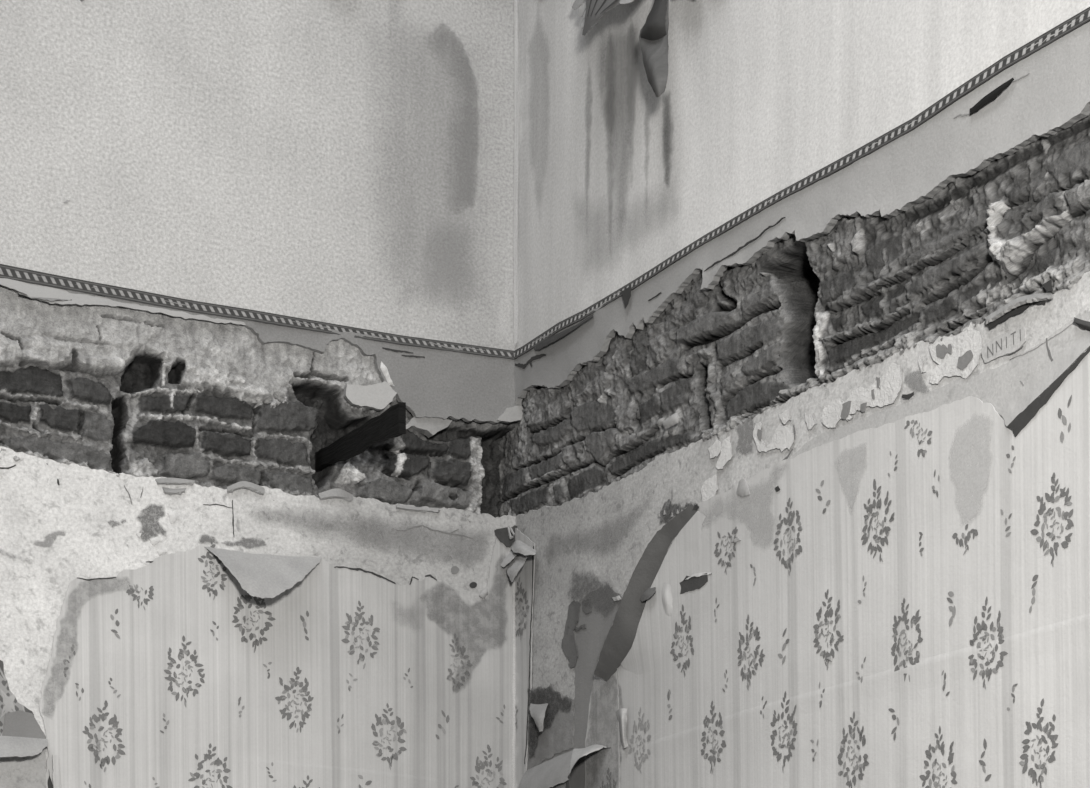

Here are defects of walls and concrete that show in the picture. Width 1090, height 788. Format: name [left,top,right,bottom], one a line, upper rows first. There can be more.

flaking render [0,114,1090,522]
flaking render [136,505,180,556]
flaking render [200,536,266,549]